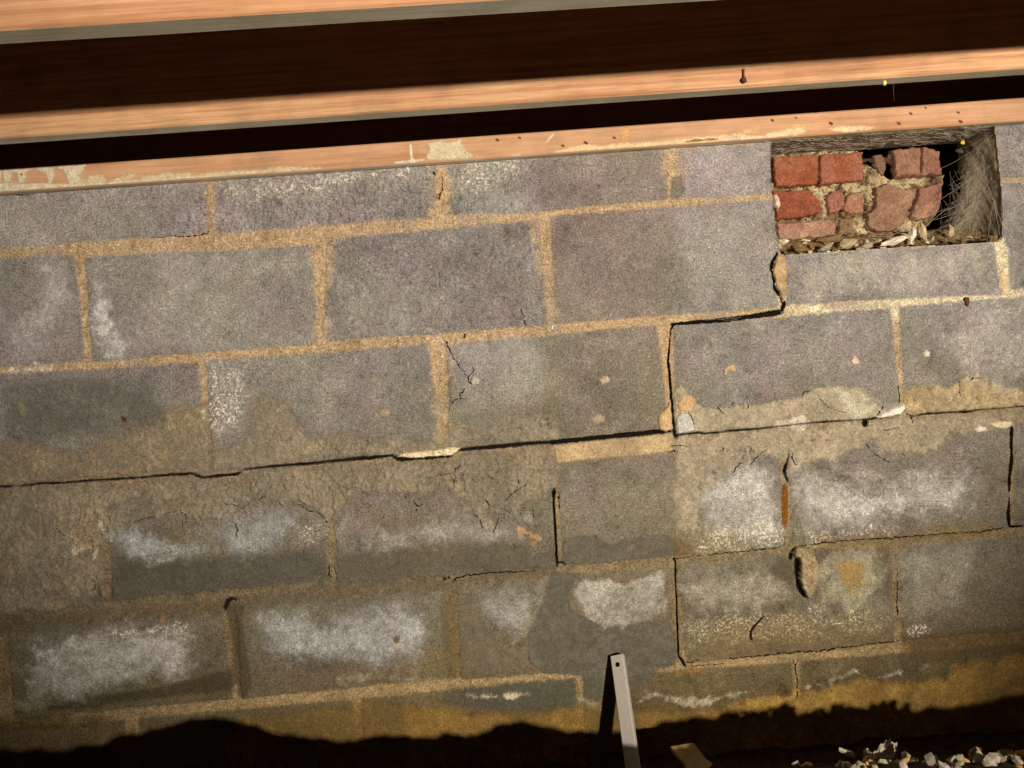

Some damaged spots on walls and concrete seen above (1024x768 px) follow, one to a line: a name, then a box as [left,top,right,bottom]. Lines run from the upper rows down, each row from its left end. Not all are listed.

spalling [856,143,964,231]
crack [0,251,1024,699]
peeling [675,412,695,434]
leakage [112,517,326,599]
leakage [339,467,794,713]
leakage [689,471,970,645]
leakage [18,603,250,713]